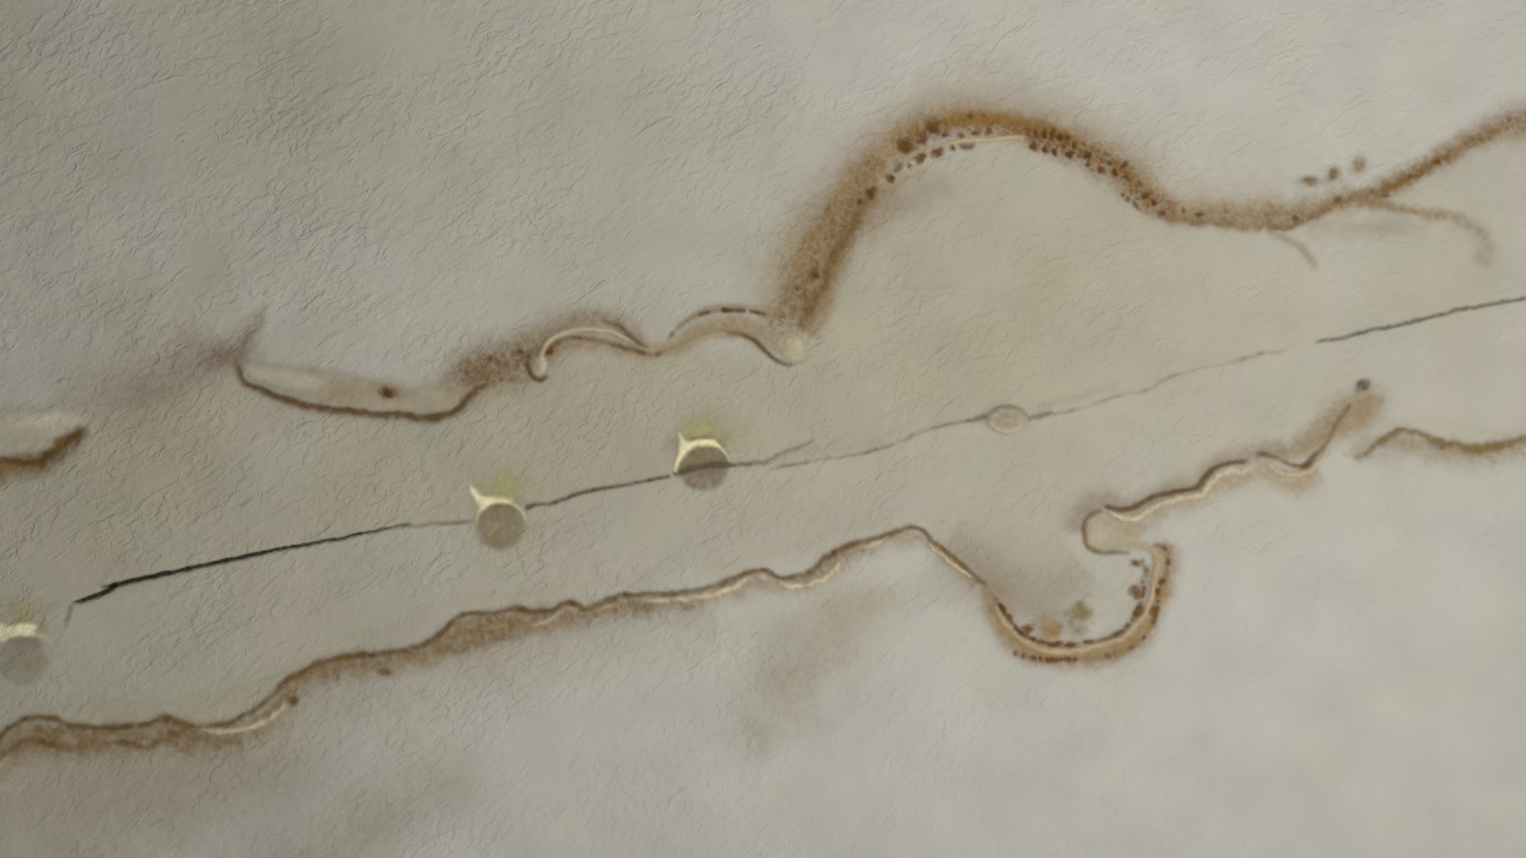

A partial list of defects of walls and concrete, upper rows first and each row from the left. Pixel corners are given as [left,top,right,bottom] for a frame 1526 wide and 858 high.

leakage [1351,128,1501,213]
leakage [791,108,1205,312]
leakage [689,306,782,363]
crack [1333,297,1525,340]
leakage [209,327,650,422]
crack [528,462,749,508]
leakage [1082,395,1371,553]
leakage [1373,429,1523,453]
crack [77,528,387,602]
spalling [0,623,36,641]
leakage [0,526,1172,765]